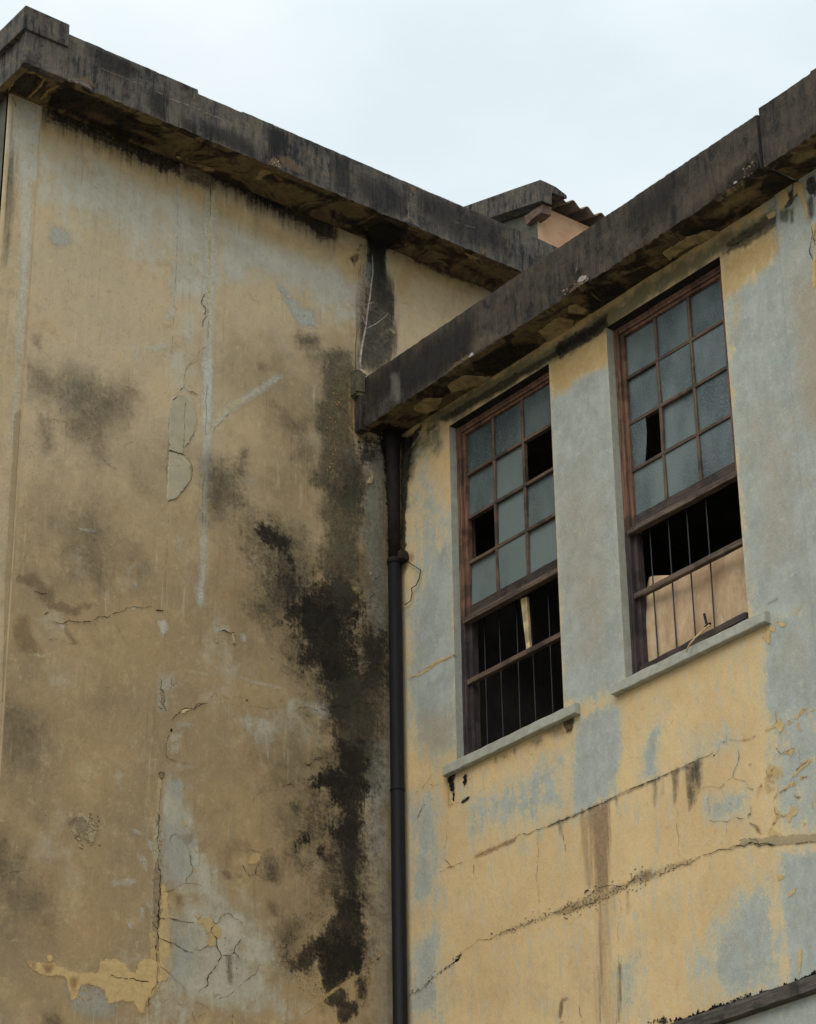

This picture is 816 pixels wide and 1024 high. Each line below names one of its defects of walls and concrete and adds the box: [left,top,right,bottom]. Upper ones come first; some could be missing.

leakage [8,71,338,239]
leakage [351,222,439,371]
leakage [413,153,816,421]
flaking render [166,359,198,502]
leakage [2,411,21,702]
crack [24,579,166,644]
peeling [28,772,195,1014]
crack [147,849,277,1024]
leakage [253,522,388,1024]
leakage [447,774,470,803]
crack [407,737,812,998]
peeling [766,747,811,836]